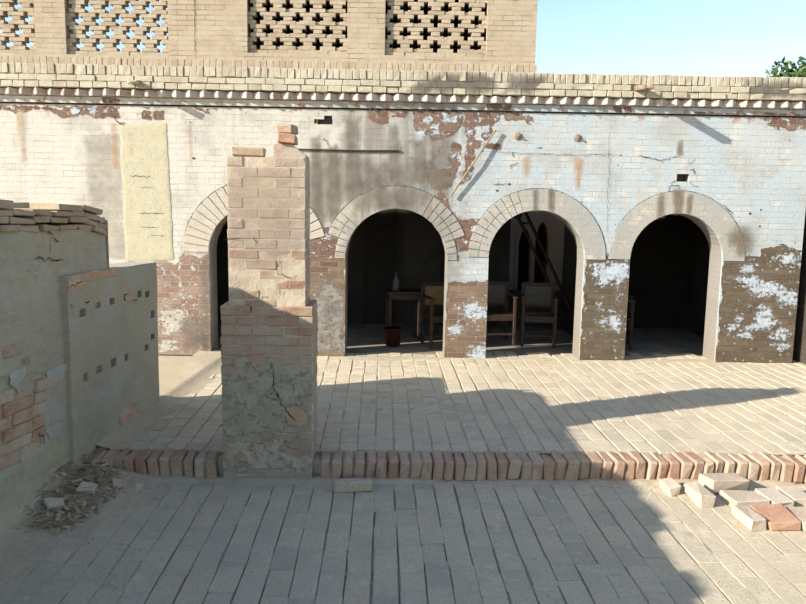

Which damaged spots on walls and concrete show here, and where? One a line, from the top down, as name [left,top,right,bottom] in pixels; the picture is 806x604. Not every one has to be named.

peeling [0,97,120,119]
peeling [368,104,537,252]
crack [640,155,698,192]
peeling [760,112,806,141]
crack [35,231,61,261]
peeling [154,253,211,355]
peeling [310,227,345,356]
peeling [444,280,488,358]
peeling [579,253,632,361]
peeling [715,242,802,363]
flaking render [0,364,67,471]
flaking render [221,352,313,475]